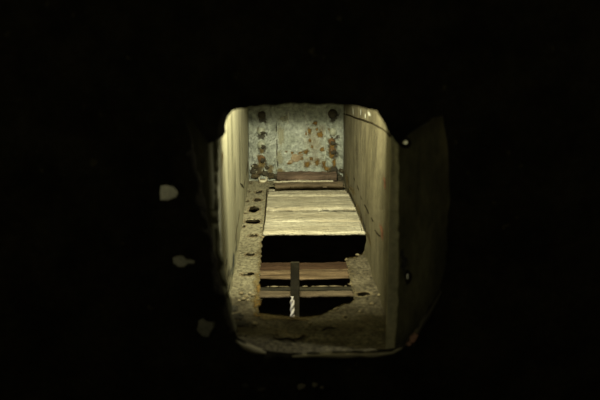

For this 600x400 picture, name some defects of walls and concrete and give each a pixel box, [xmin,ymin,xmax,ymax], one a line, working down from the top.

corrosion [250,145,291,179]
corrosion [285,121,355,195]